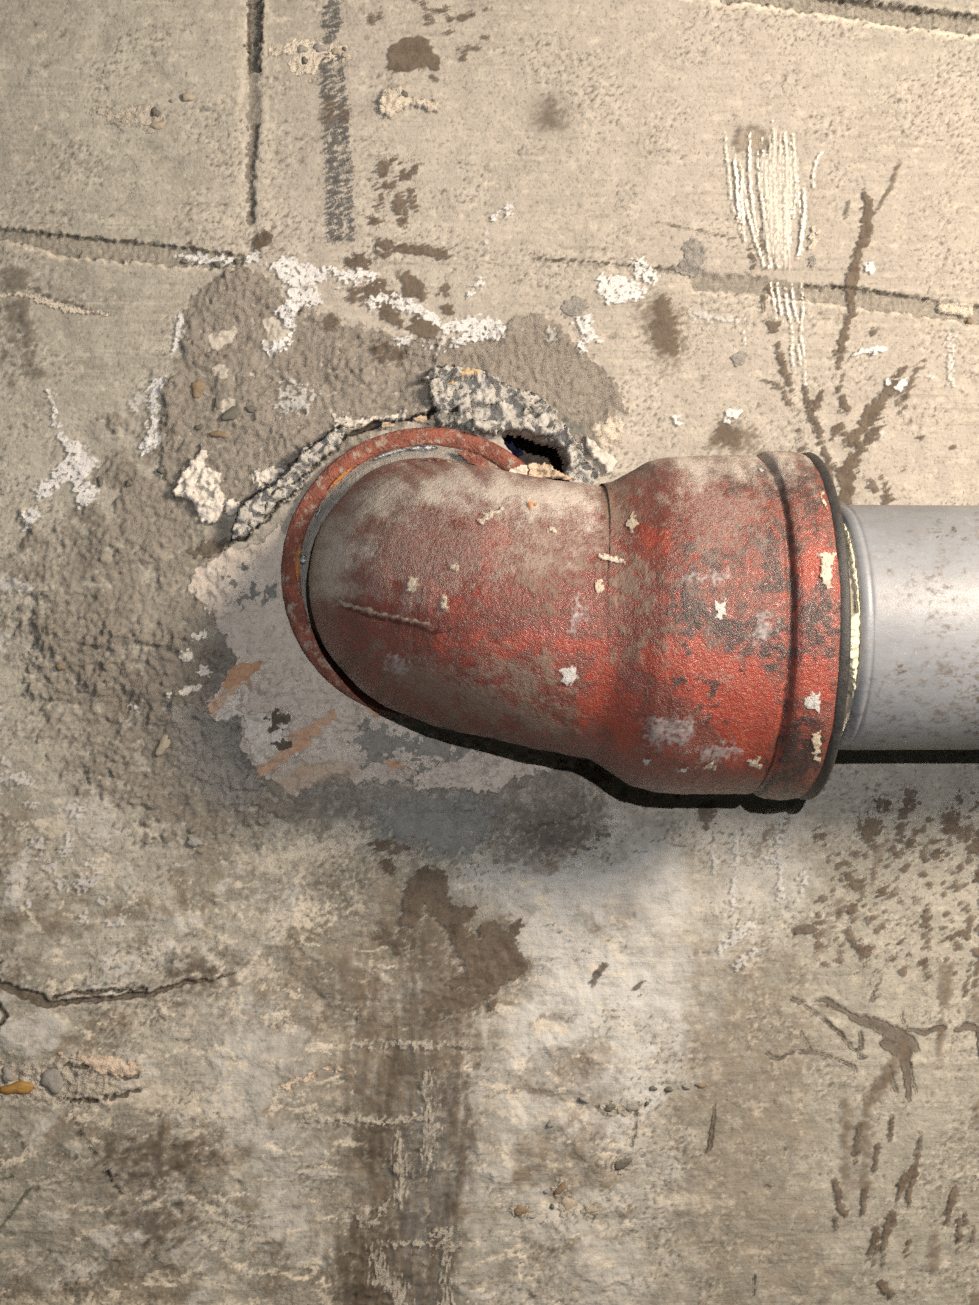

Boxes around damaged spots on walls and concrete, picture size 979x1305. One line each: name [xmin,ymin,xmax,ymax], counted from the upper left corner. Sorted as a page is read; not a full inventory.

water stain [170,314,184,352]
water stain [174,249,507,357]
water stain [572,314,603,354]
water stain [597,256,665,305]
water stain [689,308,745,326]
water stain [774,164,901,483]
water stain [128,375,168,456]
water stain [269,379,322,419]
spalling [187,364,628,559]
water stain [864,474,896,505]
water stain [299,919,473,1305]